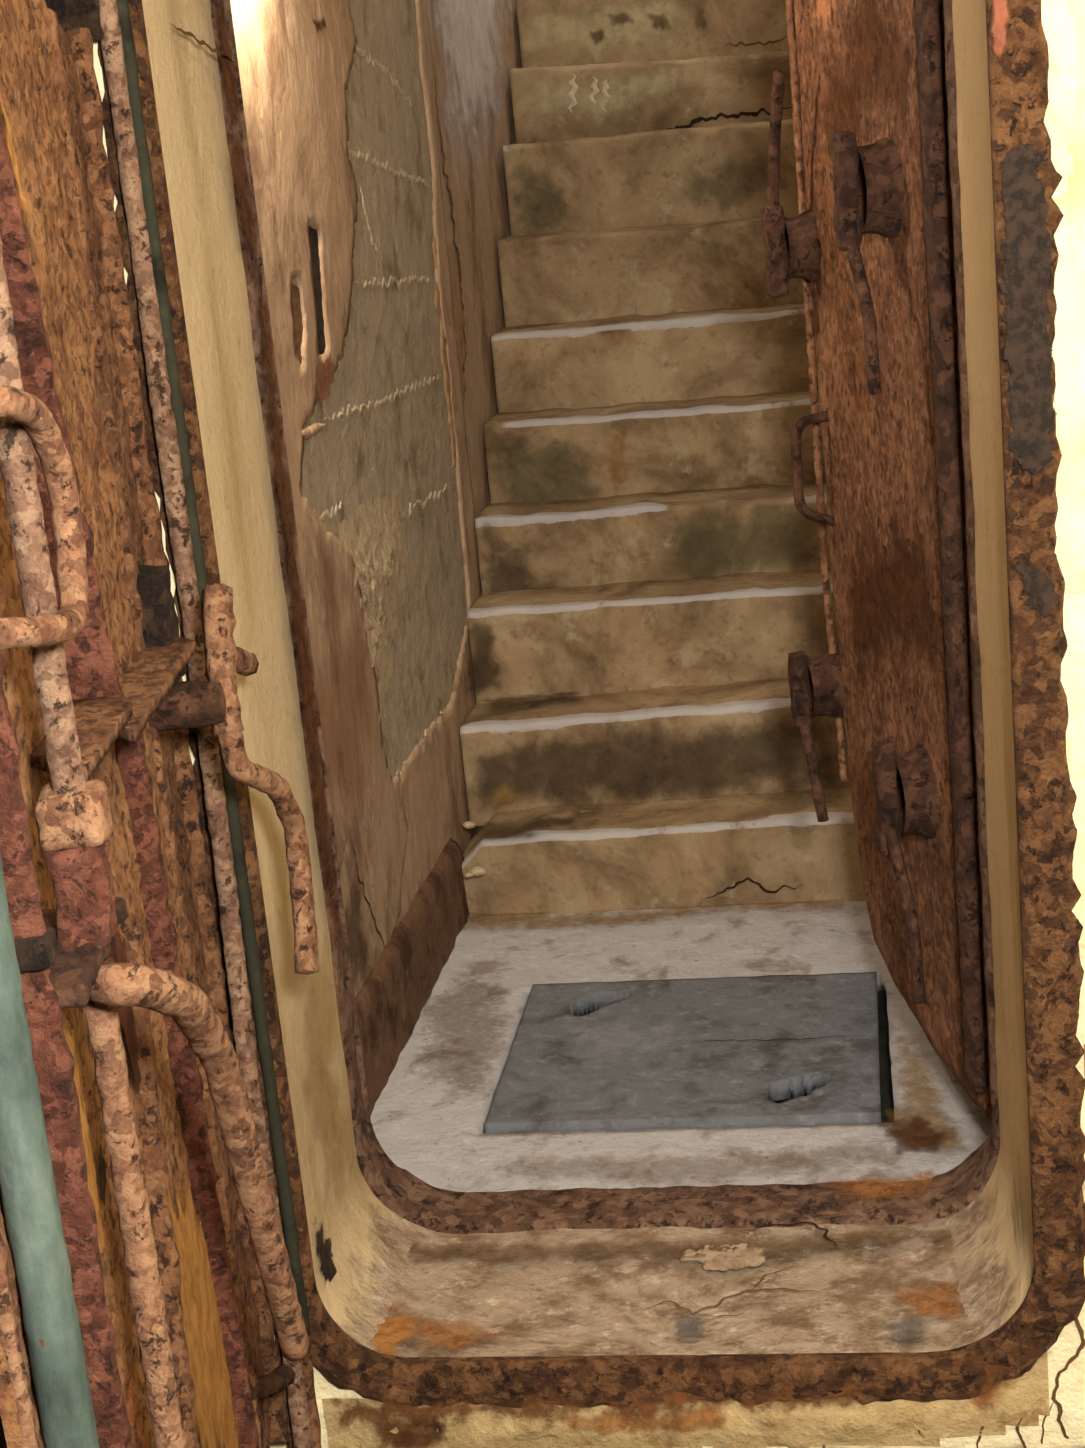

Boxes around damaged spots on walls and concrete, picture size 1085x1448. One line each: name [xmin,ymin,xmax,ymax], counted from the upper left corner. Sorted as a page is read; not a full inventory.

rust [817,0,830,27]
rust [218,4,257,252]
damp [434,0,511,159]
spalling [292,226,335,409]
rust [260,296,342,934]
rust [169,1185,239,1448]
rust [315,1216,337,1282]
rust [373,1305,491,1356]
rust [334,1384,858,1448]
rust [841,1171,937,1199]
rust [897,1283,963,1318]
crack [976,1318,1085,1448]